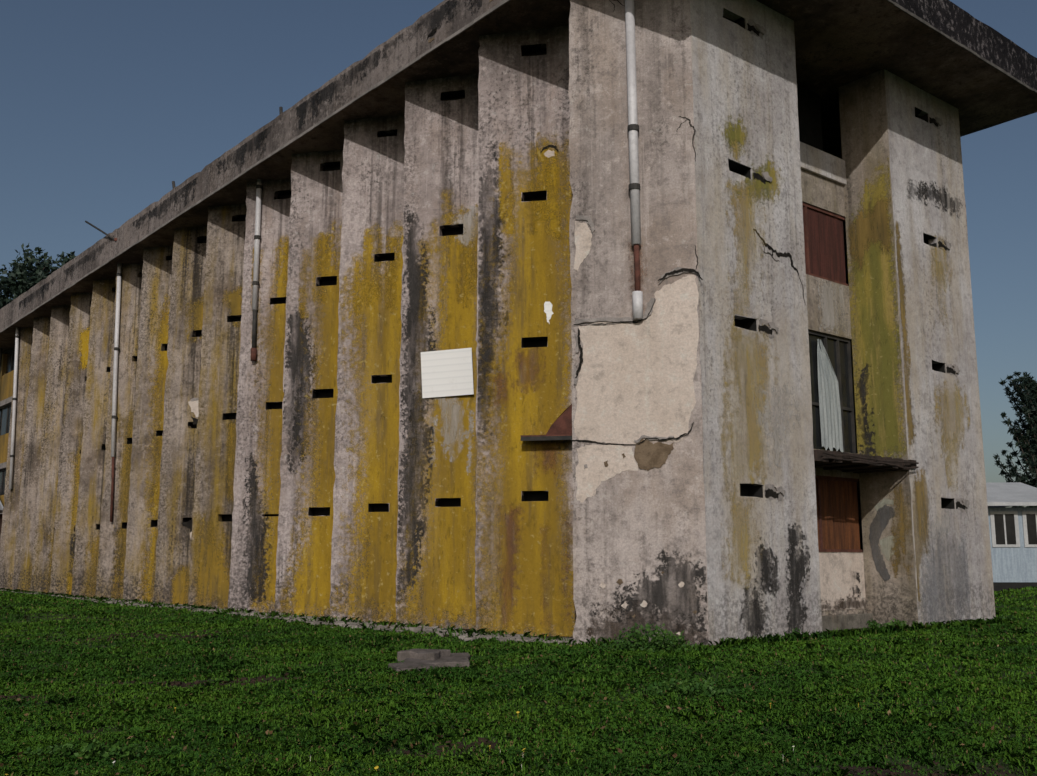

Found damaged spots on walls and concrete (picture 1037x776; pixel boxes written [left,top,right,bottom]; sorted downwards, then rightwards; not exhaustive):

crack [677,116,696,161]
spalling [188,398,199,425]
damp [283,232,330,473]
damp [353,133,561,596]
peeling [574,215,595,271]
peeling [573,267,699,503]
crack [575,245,703,378]
crack [753,229,805,303]
damp [849,196,916,456]
damp [226,423,271,604]
damp [586,549,708,645]
damp [723,485,811,637]